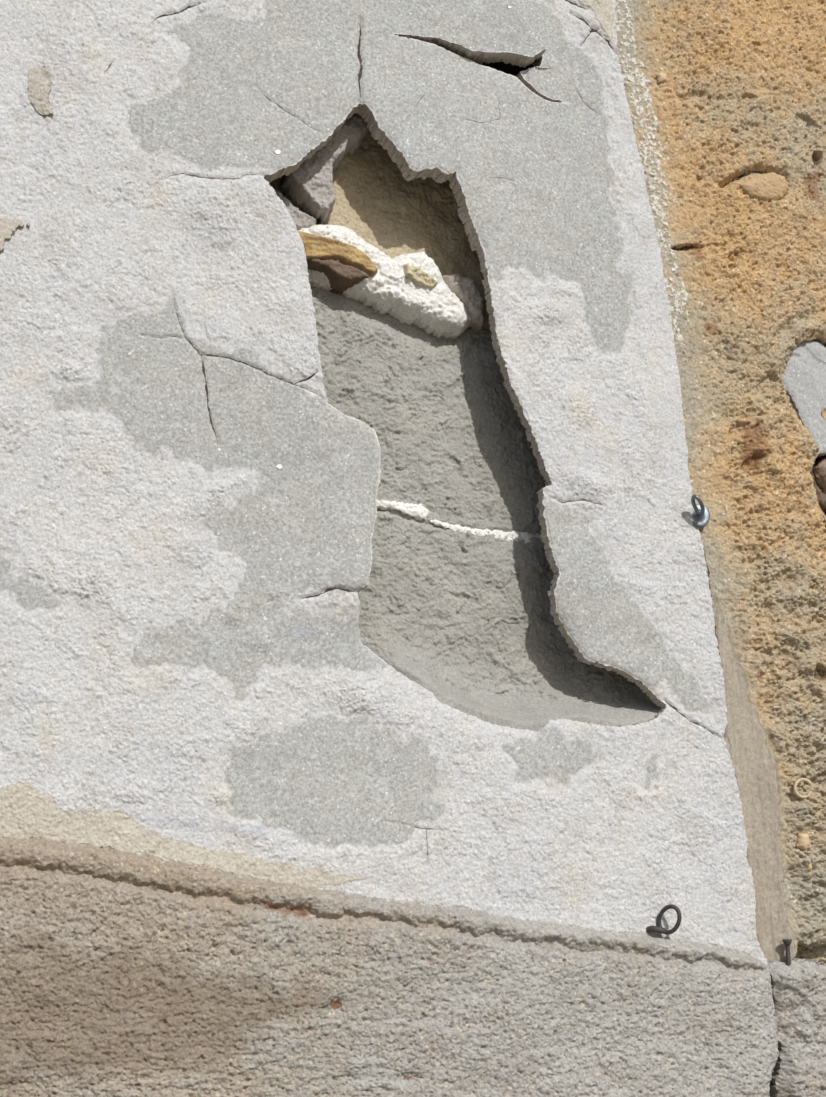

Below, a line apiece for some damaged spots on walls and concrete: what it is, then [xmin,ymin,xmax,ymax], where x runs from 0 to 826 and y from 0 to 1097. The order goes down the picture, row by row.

crack [476,60,554,76]
crack [146,301,323,445]
spalling [53,0,707,788]